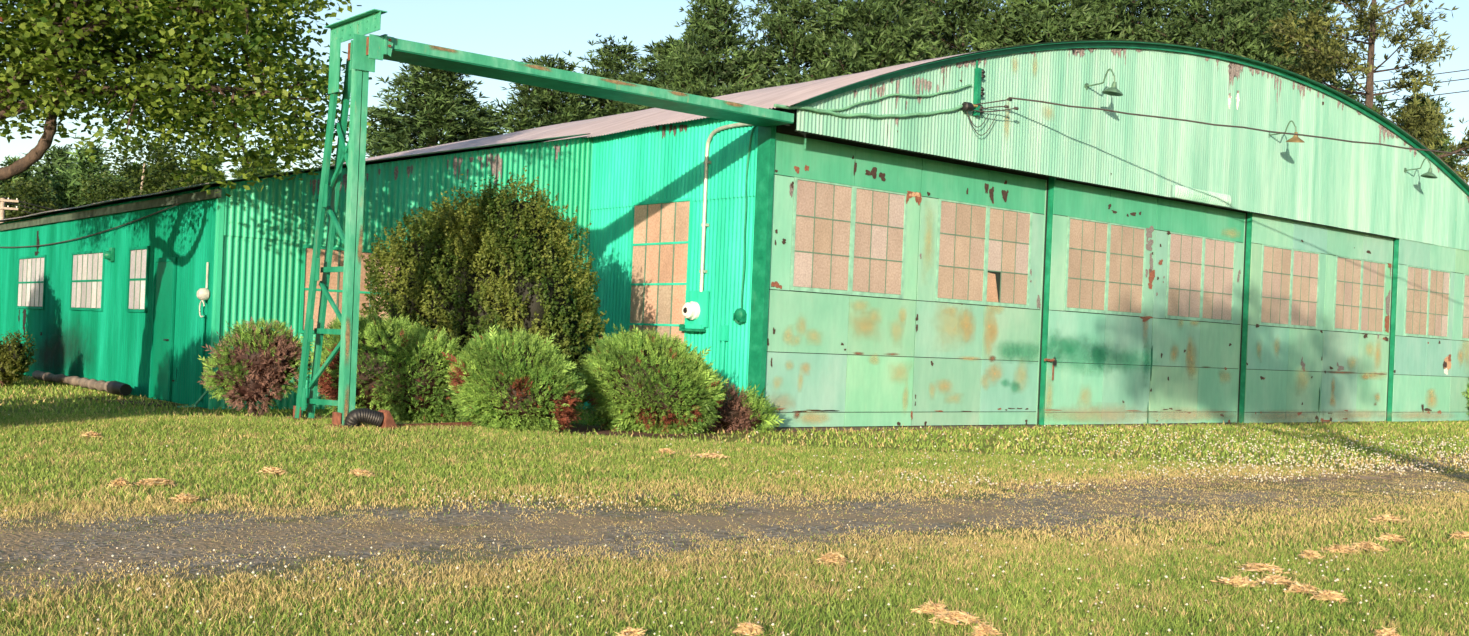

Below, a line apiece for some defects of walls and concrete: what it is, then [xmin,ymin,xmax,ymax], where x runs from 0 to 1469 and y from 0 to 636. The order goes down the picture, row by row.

peeling [1205,57,1361,115]